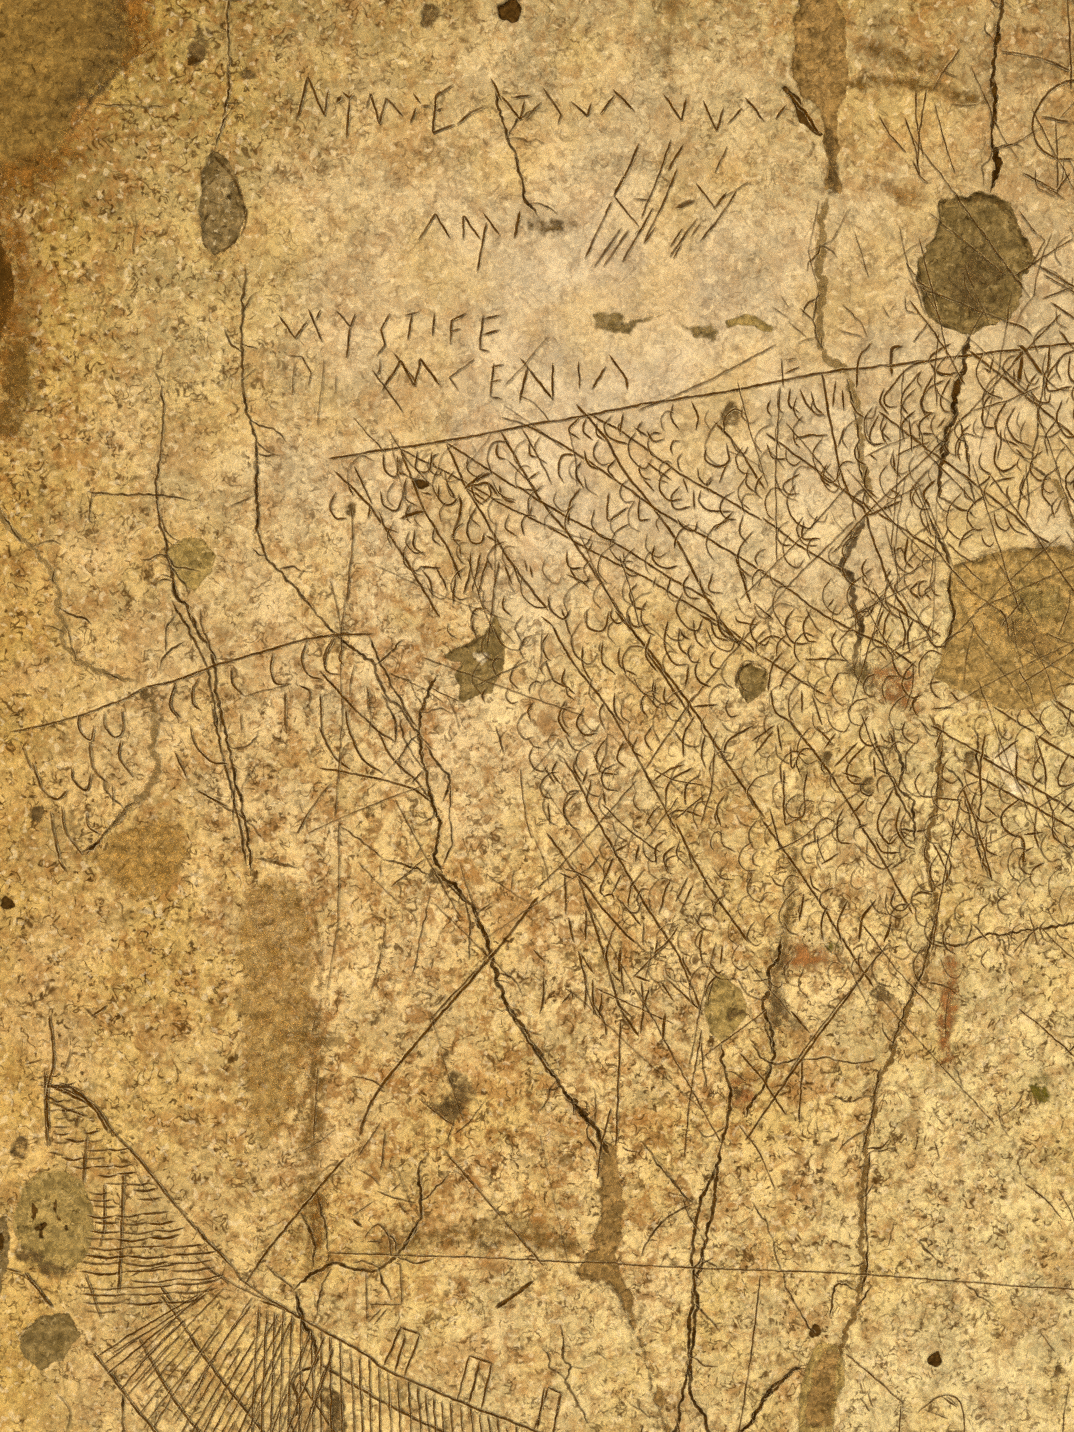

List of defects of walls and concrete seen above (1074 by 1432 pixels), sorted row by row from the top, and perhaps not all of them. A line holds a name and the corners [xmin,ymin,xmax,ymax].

spalling [198,151,247,256]
spalling [916,191,1037,335]
crack [84,375,293,870]
spalling [445,616,505,703]
crack [225,0,1074,1432]
crack [121,1393,157,1432]